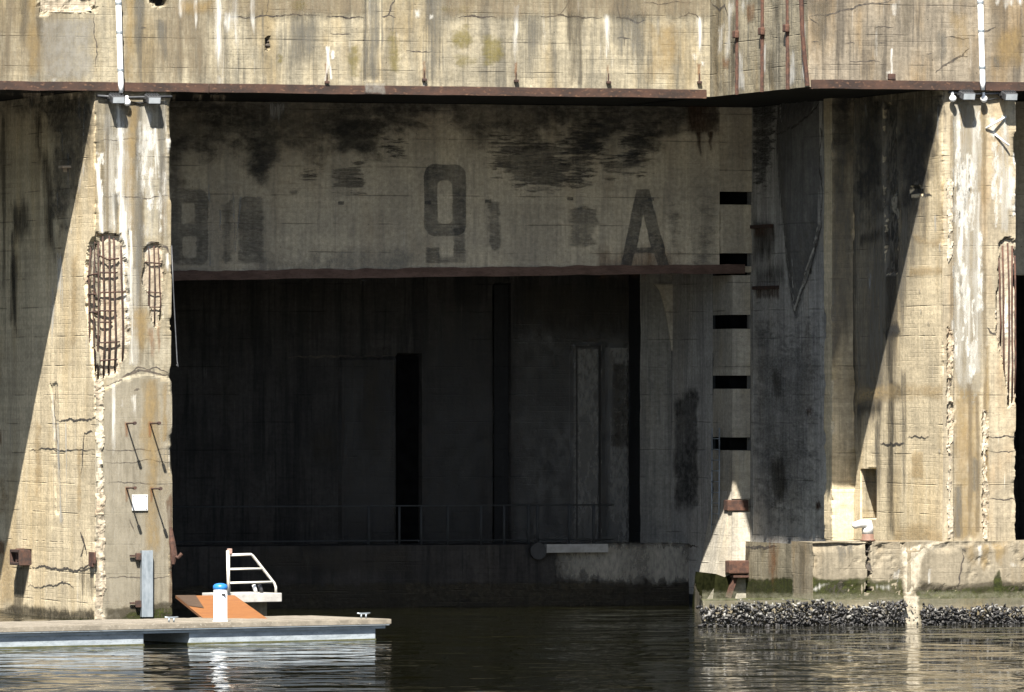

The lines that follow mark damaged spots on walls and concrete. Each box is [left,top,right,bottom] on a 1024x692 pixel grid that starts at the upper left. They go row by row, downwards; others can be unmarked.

spalling [83,232,131,619]
water stain [83,104,169,343]
spalling [142,243,164,328]
crack [865,540,873,583]
spalling [938,329,954,538]
water stain [942,110,1016,449]
spalling [981,409,989,539]
spalling [995,240,1016,405]